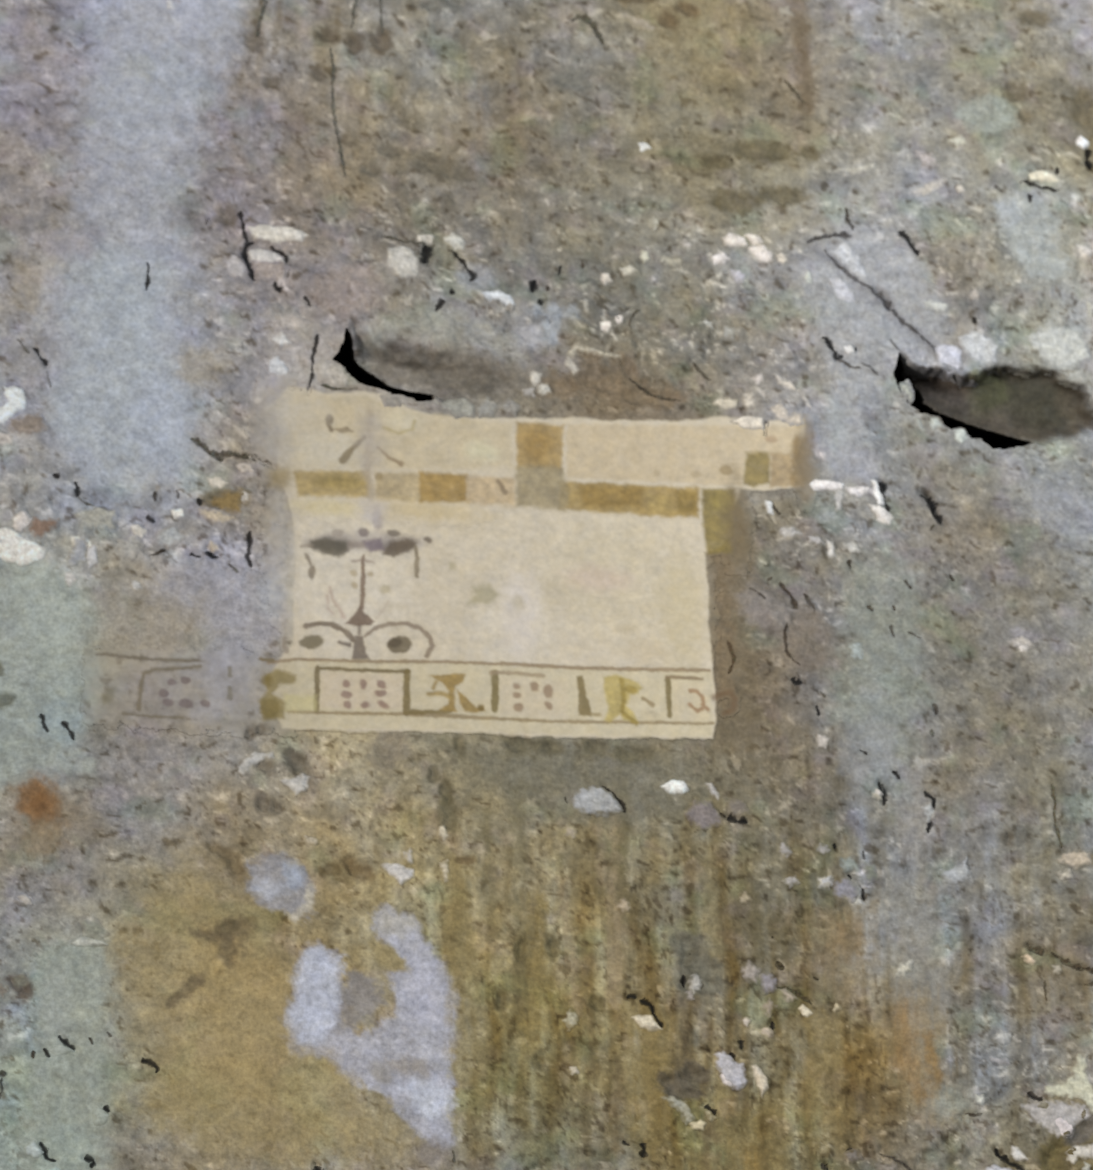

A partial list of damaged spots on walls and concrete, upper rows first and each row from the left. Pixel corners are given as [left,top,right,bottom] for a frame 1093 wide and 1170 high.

spalling [828,239,868,303]
spalling [268,311,311,376]
spalling [315,328,552,419]
spalling [893,298,1093,450]